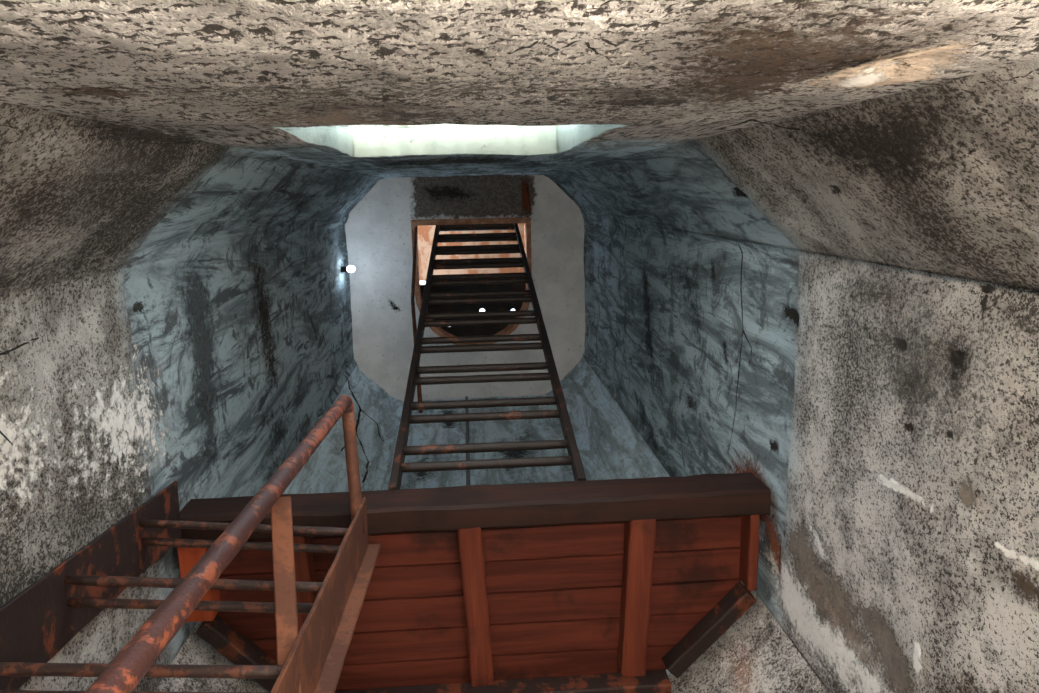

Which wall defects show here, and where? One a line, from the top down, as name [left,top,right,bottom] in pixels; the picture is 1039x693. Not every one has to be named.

peeling [808,40,976,89]
crack [0,337,39,355]